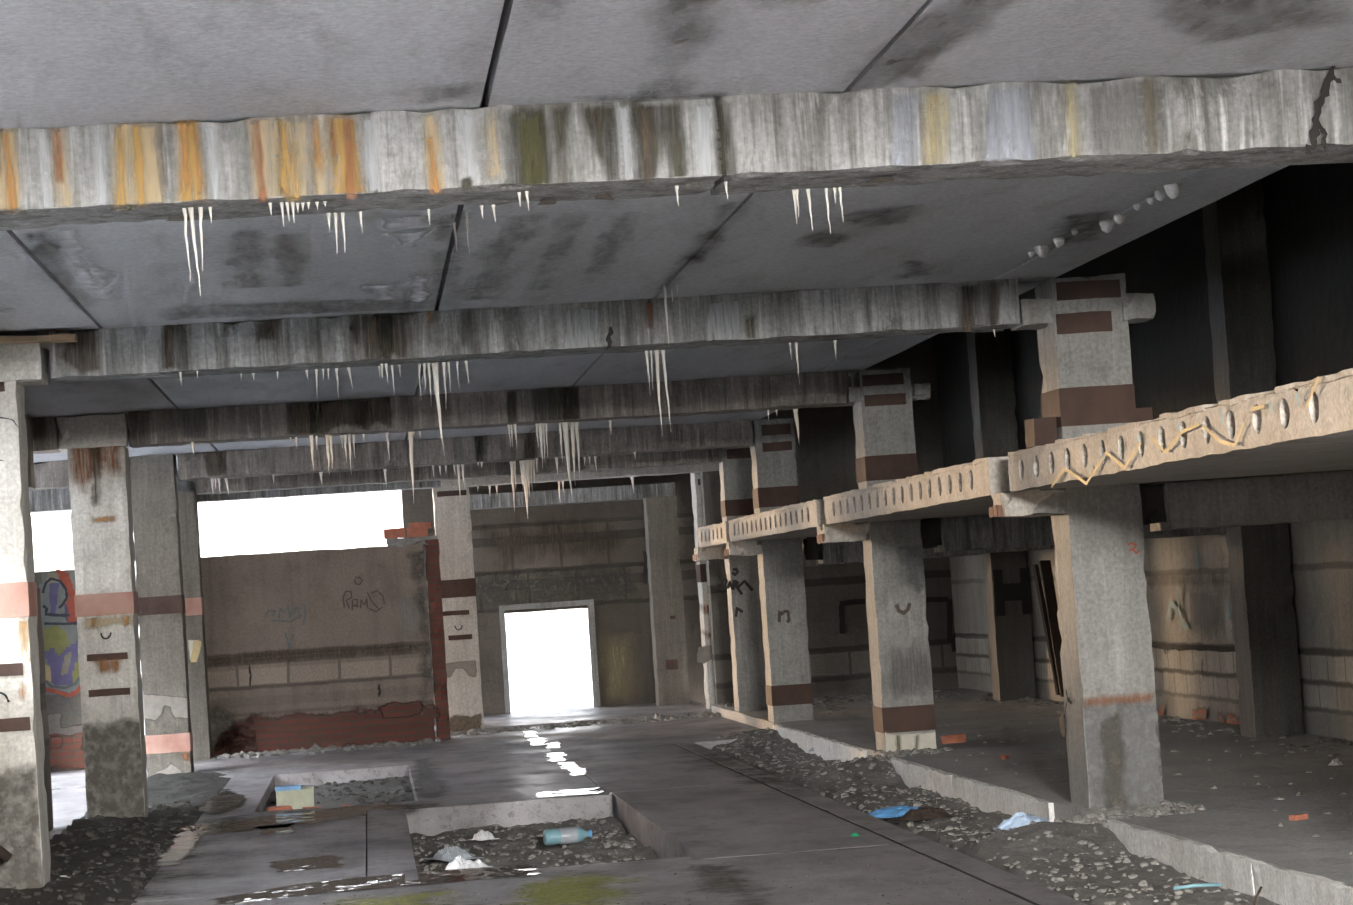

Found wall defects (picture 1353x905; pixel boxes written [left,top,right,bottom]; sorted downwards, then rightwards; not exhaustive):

corrosion [0,131,20,211]
corrosion [53,131,71,207]
corrosion [114,123,162,206]
corrosion [180,121,201,201]
corrosion [250,117,362,201]
leakage [508,106,567,184]
leakage [585,91,736,182]
crack [1306,66,1342,155]
leakage [287,397,391,434]
leakage [475,437,483,462]
leakage [507,392,517,423]
leakage [524,388,579,458]